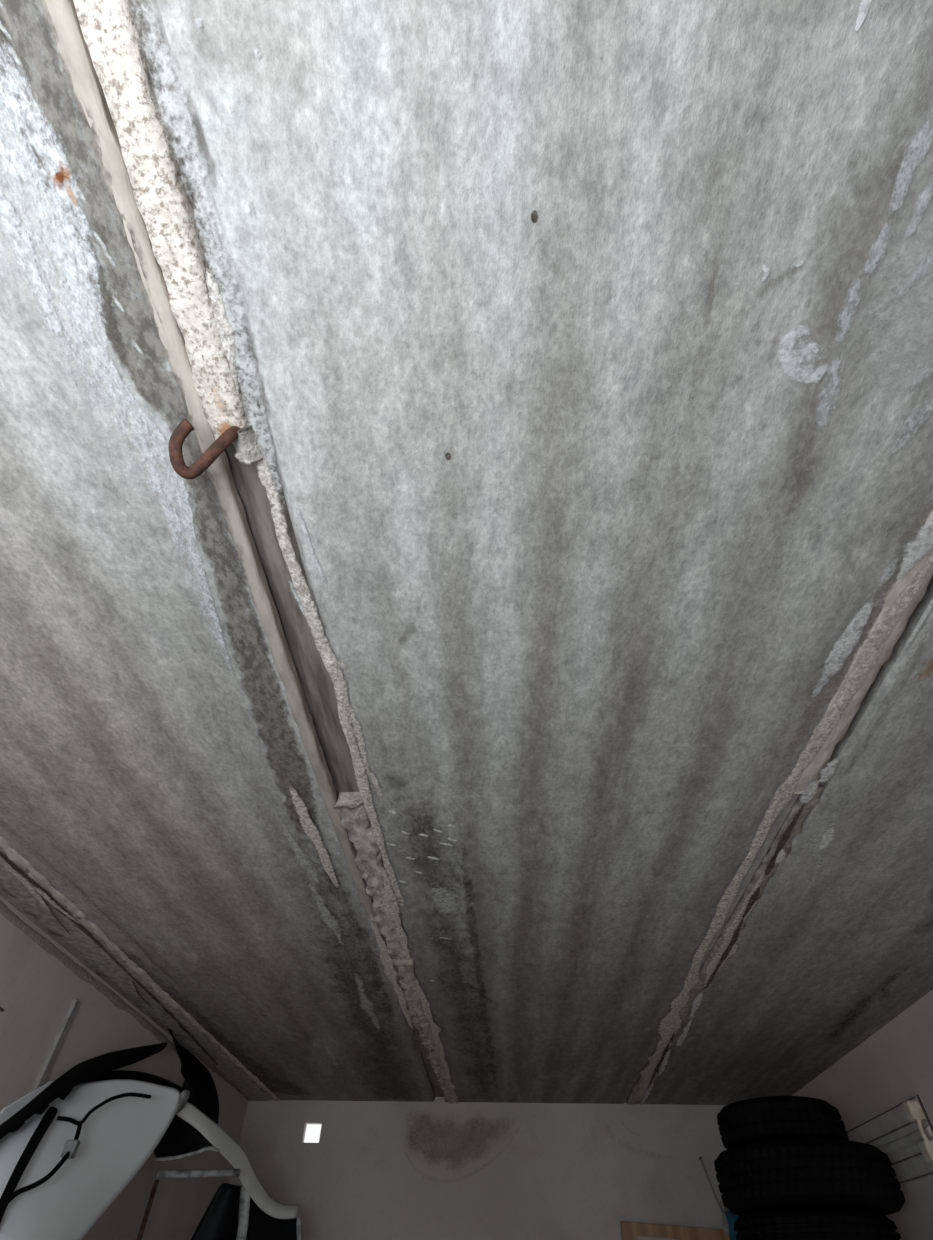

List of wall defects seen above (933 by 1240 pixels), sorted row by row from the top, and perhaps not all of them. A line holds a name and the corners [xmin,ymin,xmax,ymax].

crack [0,853,217,1064]
water stain [0,0,417,1099]
peeling [206,268,239,394]
peeling [232,417,460,1091]
water stain [411,803,495,1097]
spalling [633,503,933,1104]